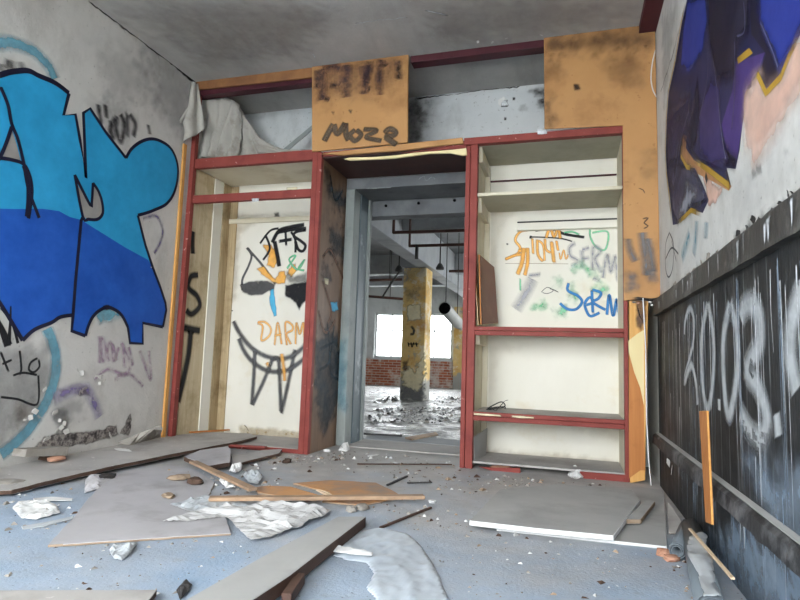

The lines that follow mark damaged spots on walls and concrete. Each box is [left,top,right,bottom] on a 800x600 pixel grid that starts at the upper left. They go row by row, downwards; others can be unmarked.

flaking render [36,409,132,447]